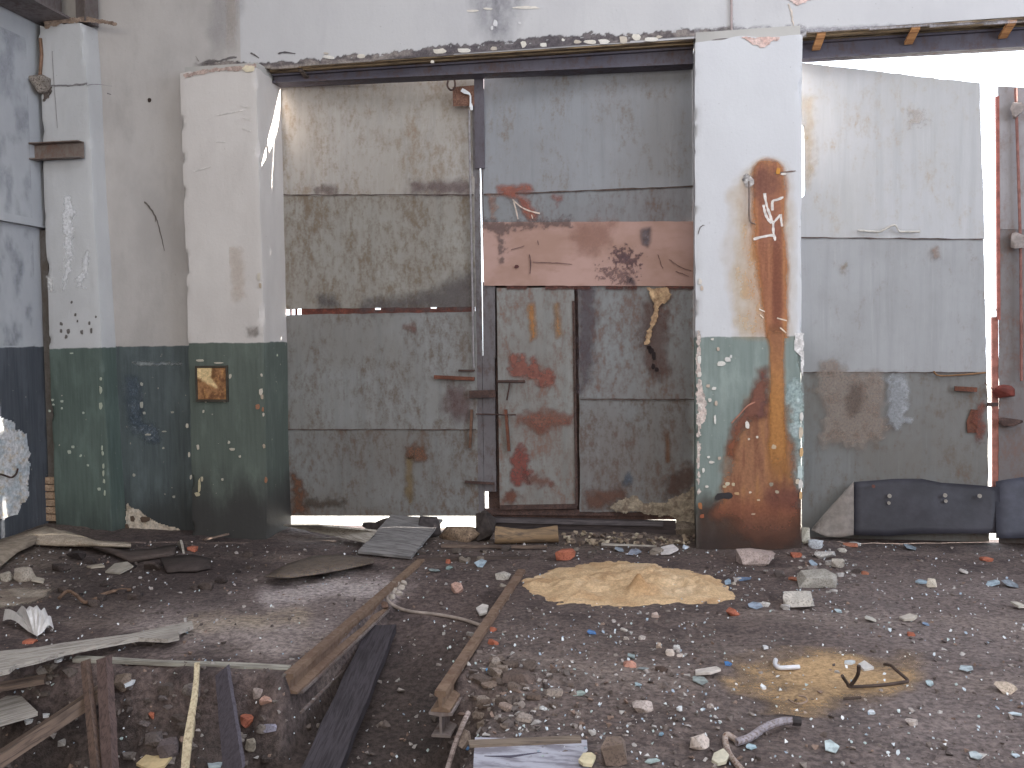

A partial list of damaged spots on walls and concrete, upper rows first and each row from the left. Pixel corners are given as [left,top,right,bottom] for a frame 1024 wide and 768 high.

peeling [183,27,729,78]
corrosion [489,184,540,219]
crack [144,202,165,251]
corrosion [507,353,556,387]
corrosion [700,160,802,550]
corrosion [518,411,574,433]
peeling [695,330,760,518]
corrosion [504,443,553,503]
spalling [125,503,180,530]